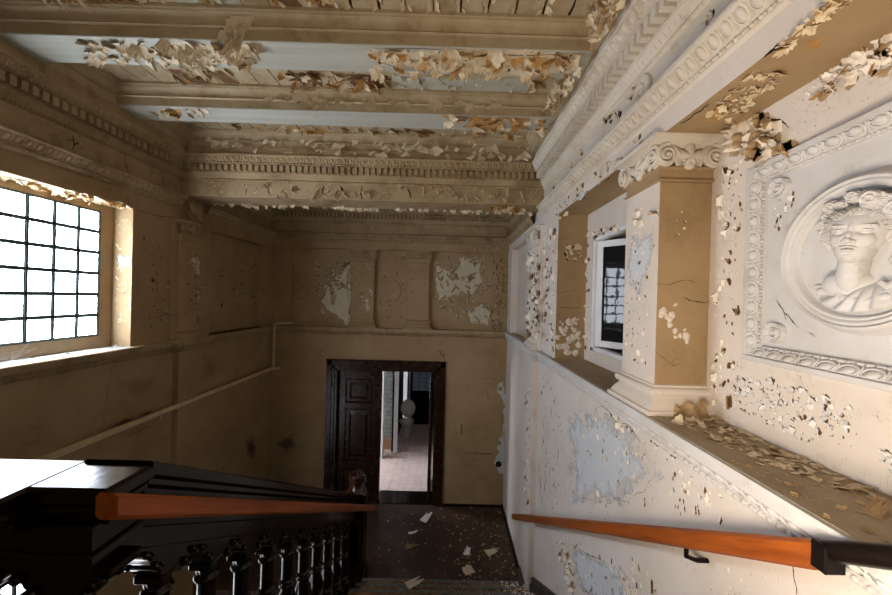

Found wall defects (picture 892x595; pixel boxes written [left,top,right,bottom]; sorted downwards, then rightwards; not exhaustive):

peeling [75,0,262,86]
peeling [149,108,209,123]
peeling [204,0,627,163]
peeling [773,0,853,59]
peeling [803,33,892,102]
peeling [311,259,373,326]
peeling [432,255,509,331]
peeling [523,150,623,352]
peeling [624,205,658,365]
peeling [705,72,857,447]
peeling [568,406,723,525]
peeling [556,540,656,595]